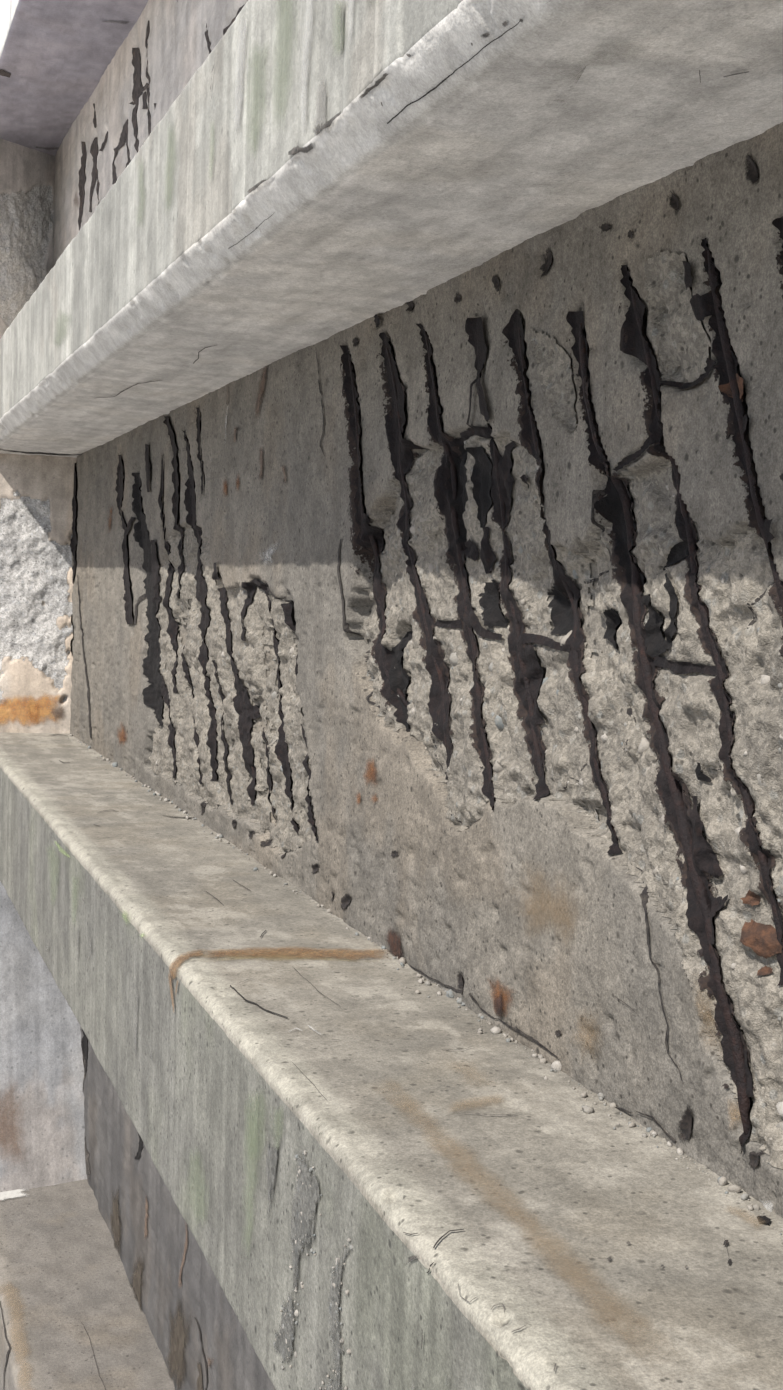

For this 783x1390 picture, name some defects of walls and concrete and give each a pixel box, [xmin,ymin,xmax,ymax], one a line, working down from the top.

spalling [78,20,157,230]
spalling [205,0,248,54]
crack [387,21,520,124]
spalling [644,249,711,391]
rust [0,696,63,724]
spalling [0,490,74,704]
spalling [143,525,311,858]
spalling [355,433,783,1169]
rust [566,238,783,1154]
rust [169,929,403,1010]
crack [613,863,682,1081]
crack [616,1107,676,1141]